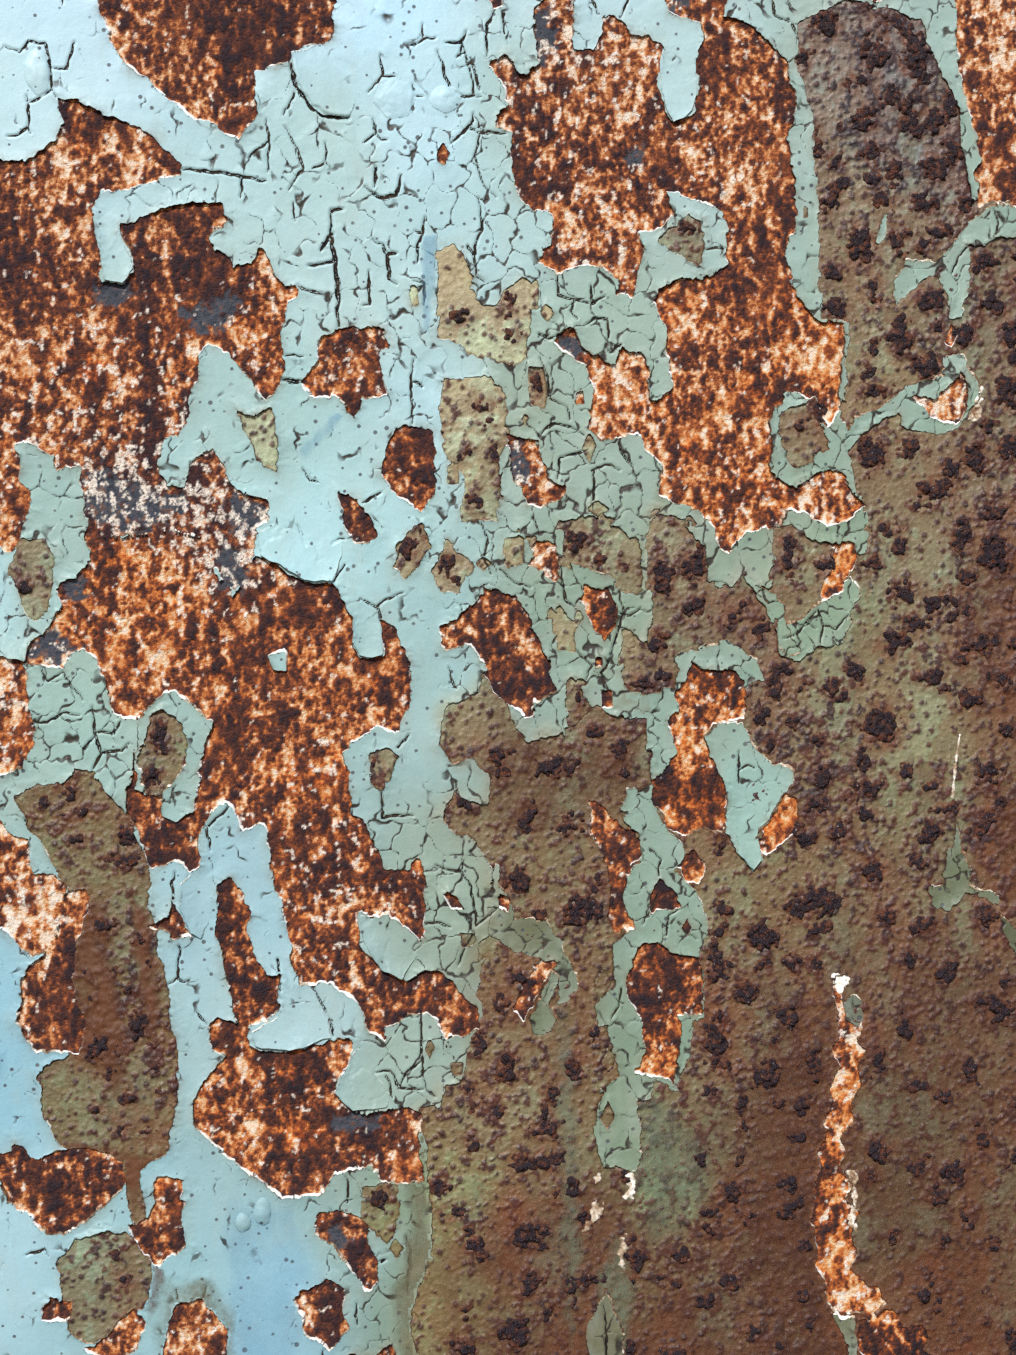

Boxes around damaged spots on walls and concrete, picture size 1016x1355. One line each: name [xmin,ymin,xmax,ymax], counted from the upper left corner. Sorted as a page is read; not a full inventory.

corrosion [97,0,356,140]
crack [183,10,506,331]
peeling [237,407,279,472]
crack [538,275,633,511]
corrosion [489,0,1016,712]
peeling [7,536,55,621]
peeling [133,689,214,822]
corrosion [0,97,566,1276]
peeling [393,0,1016,1355]
crack [425,860,497,964]
crack [376,1011,436,1098]
corrosion [623,885,931,1355]